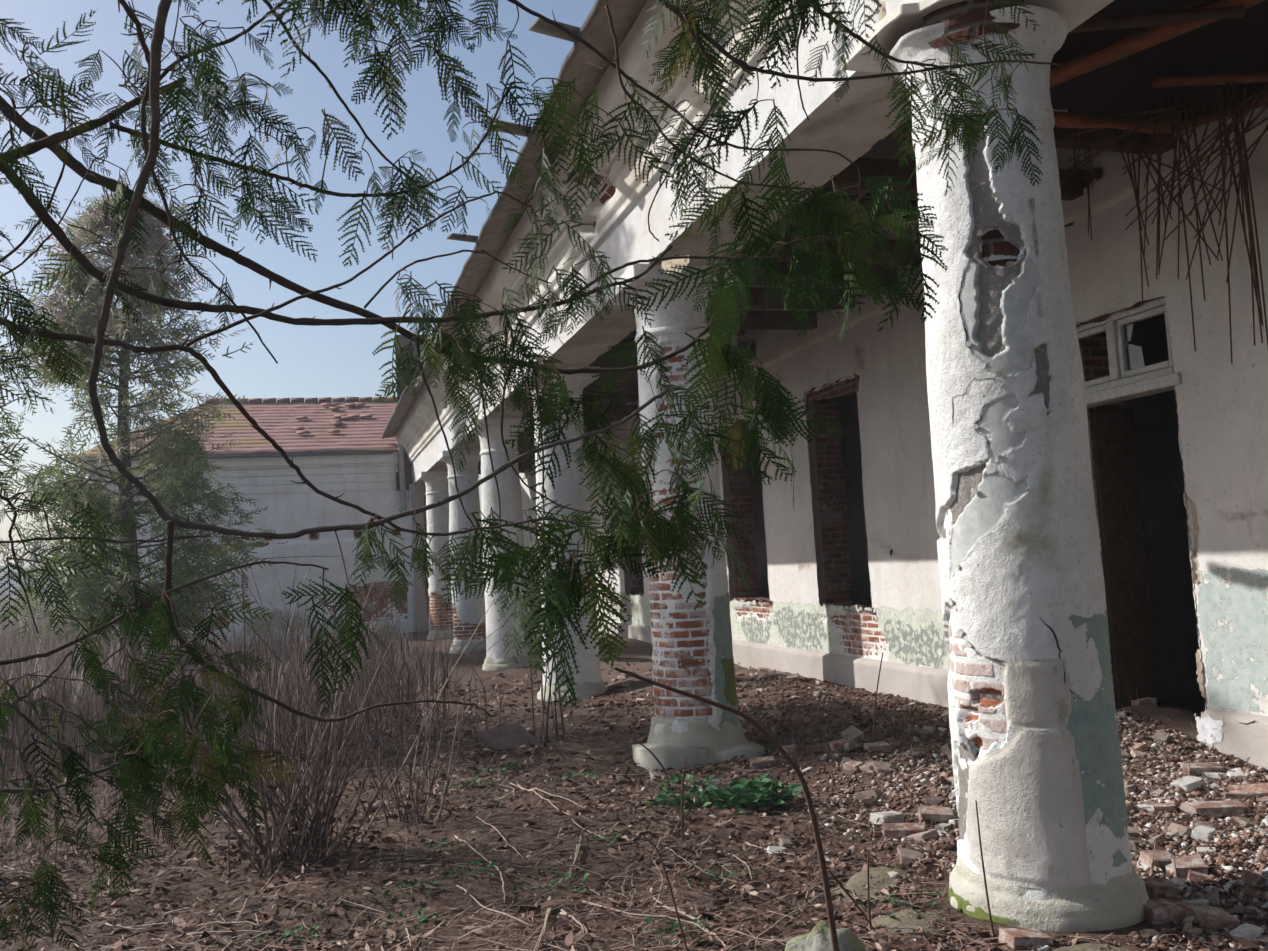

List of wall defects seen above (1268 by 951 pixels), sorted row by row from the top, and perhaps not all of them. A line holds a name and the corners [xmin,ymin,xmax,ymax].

flaking render [661,255,689,274]
crack [952,276,1002,450]
flaking render [941,112,1058,582]
flaking render [596,342,1008,840]
peeling [1067,609,1128,839]
peeling [1183,493,1268,746]